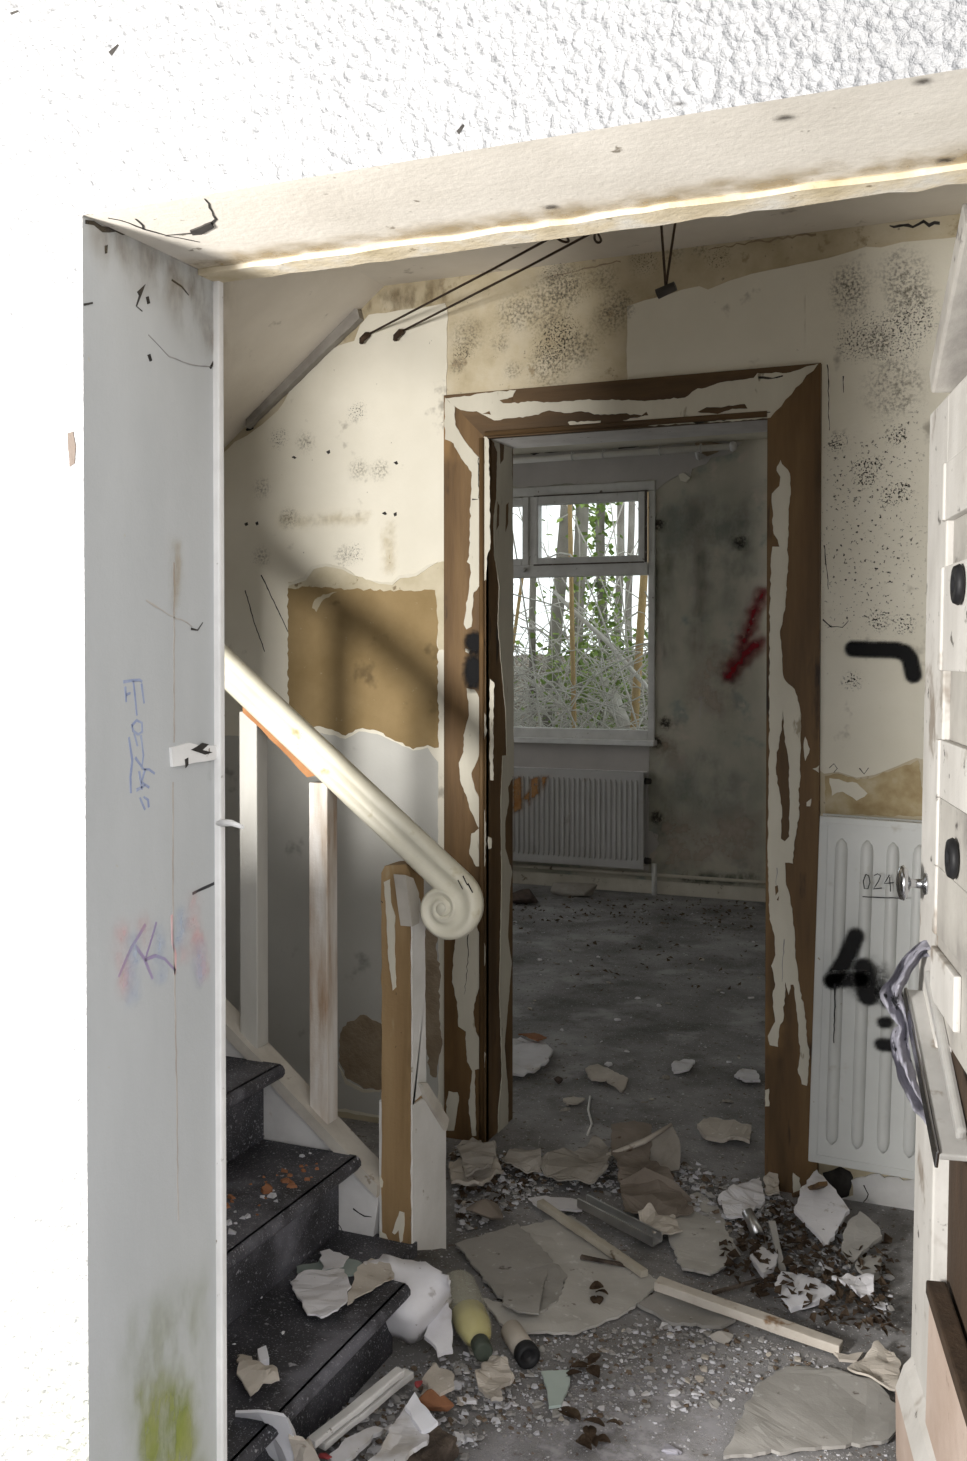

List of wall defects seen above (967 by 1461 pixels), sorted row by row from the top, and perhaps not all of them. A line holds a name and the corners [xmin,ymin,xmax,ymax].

water stain [540,318,584,380]
water stain [846,295,932,356]
peeling [287,561,444,749]
peeling [425,364,818,1136]
peeling [767,460,923,1086]
peeling [384,879,396,990]
spalling [338,1015,382,1093]
peeling [793,1173,801,1193]
peeling [380,1211,405,1243]
water stain [143,1390,193,1461]